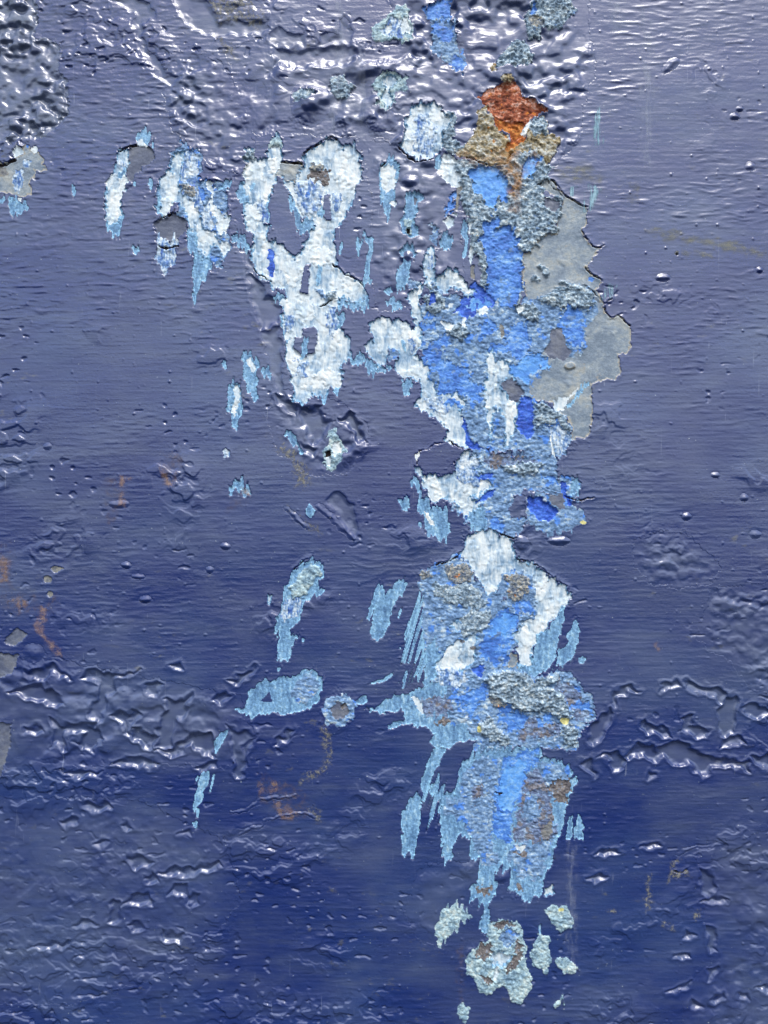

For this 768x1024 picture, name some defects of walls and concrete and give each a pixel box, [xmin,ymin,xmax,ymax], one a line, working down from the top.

peeling [0,144,47,218]
peeling [372,70,408,111]
rust [454,73,561,190]
peeling [104,101,768,1008]
peeling [9,663,256,835]
peeling [31,940,70,950]